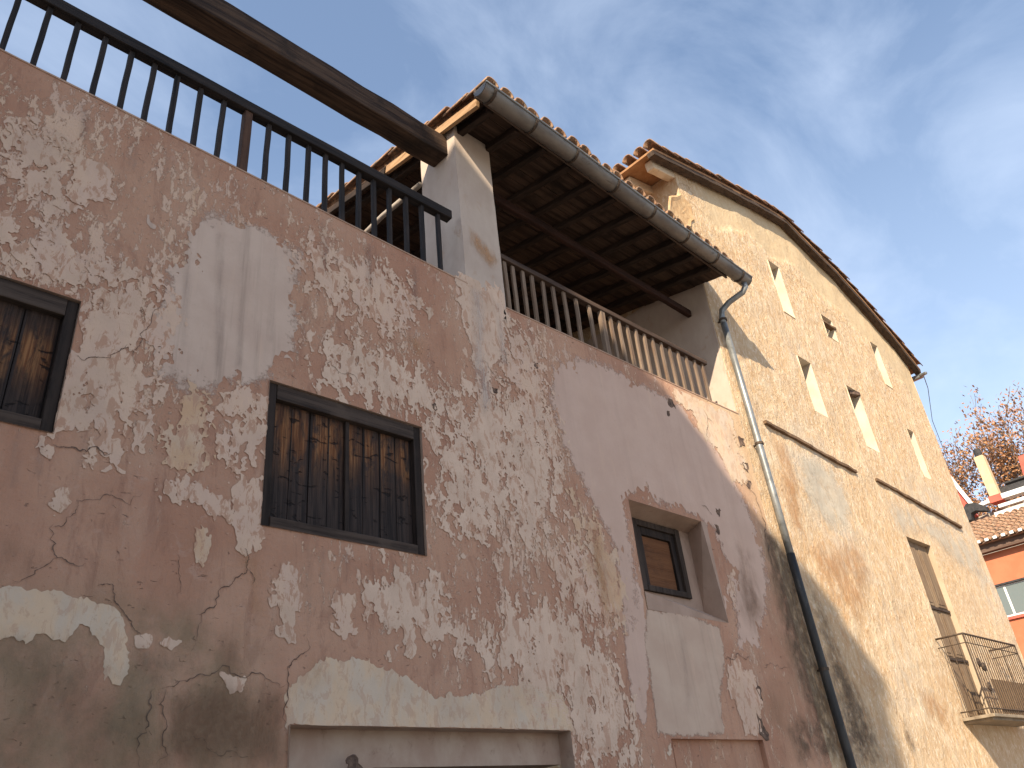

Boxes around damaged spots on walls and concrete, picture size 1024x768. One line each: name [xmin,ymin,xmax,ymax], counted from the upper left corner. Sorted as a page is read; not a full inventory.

spalling [668,193,705,240]
peeling [0,116,269,568]
peeling [667,386,751,489]
peeling [284,216,655,768]
crack [15,494,142,582]
peeling [0,585,182,685]
crack [101,584,142,637]
crack [136,549,310,767]
peeling [219,671,247,694]
peeling [268,561,303,644]
peeling [722,654,769,741]